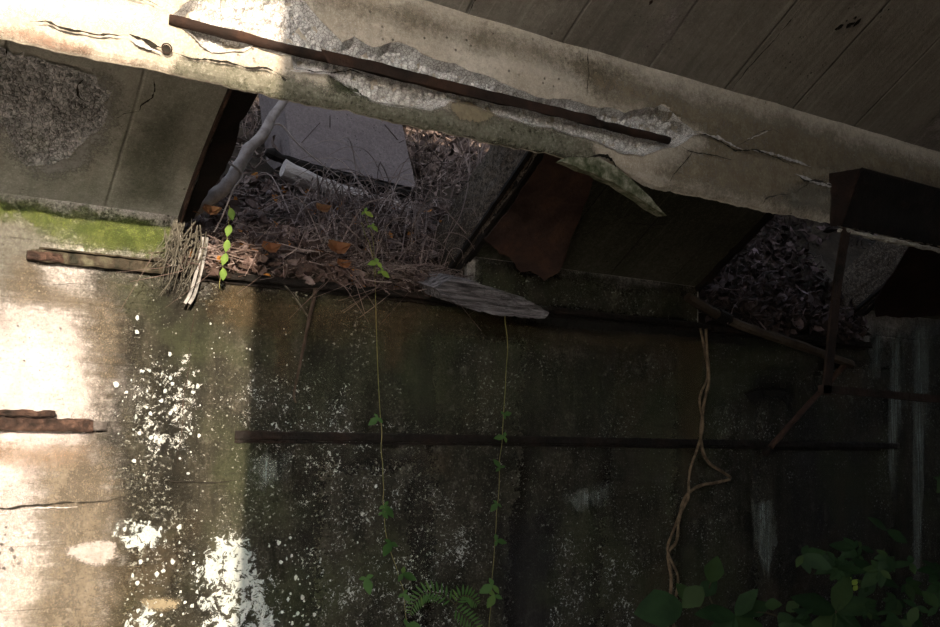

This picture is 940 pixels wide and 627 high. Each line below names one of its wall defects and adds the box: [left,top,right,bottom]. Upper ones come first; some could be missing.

flaking render [0,47,112,166]
crack [30,21,375,81]
spalling [174,0,699,156]
peeling [555,157,667,217]
crack [670,130,832,202]
damp [0,200,172,419]
crack [0,496,121,514]
damp [0,430,284,627]
damp [297,257,791,627]
damp [745,325,929,627]